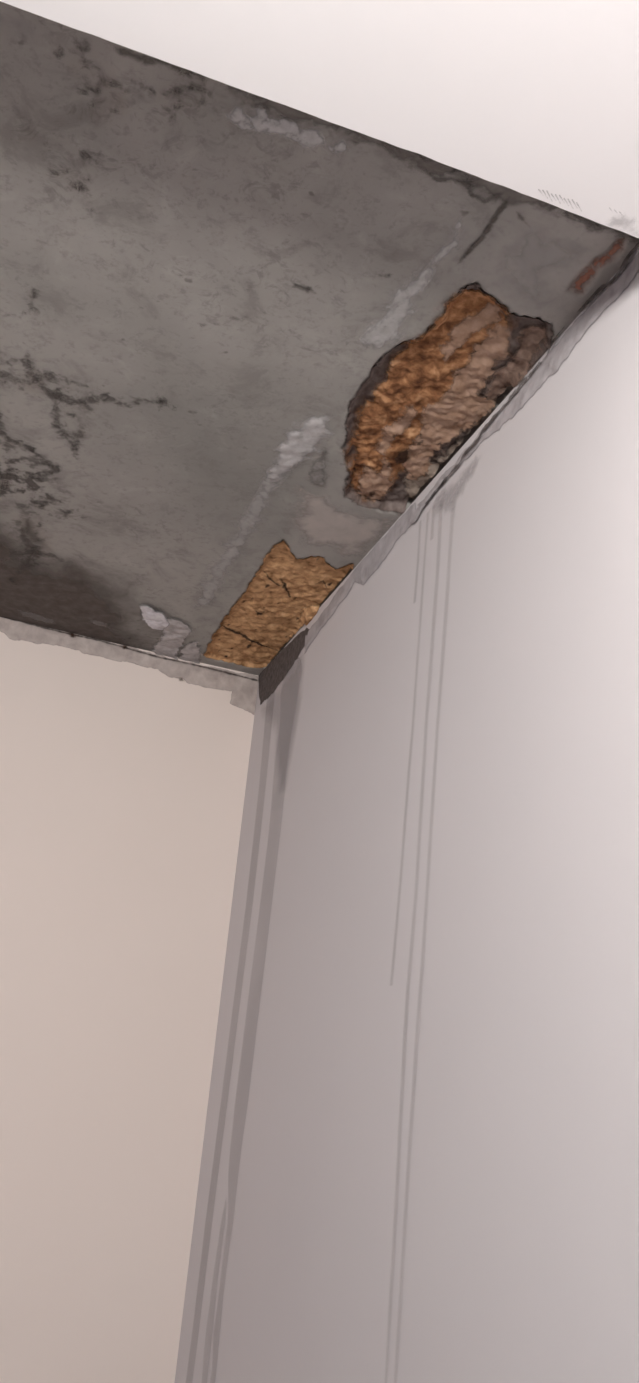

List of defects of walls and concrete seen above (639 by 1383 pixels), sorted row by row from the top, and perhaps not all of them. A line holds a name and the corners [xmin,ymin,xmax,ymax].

spalling [0,238,639,715]